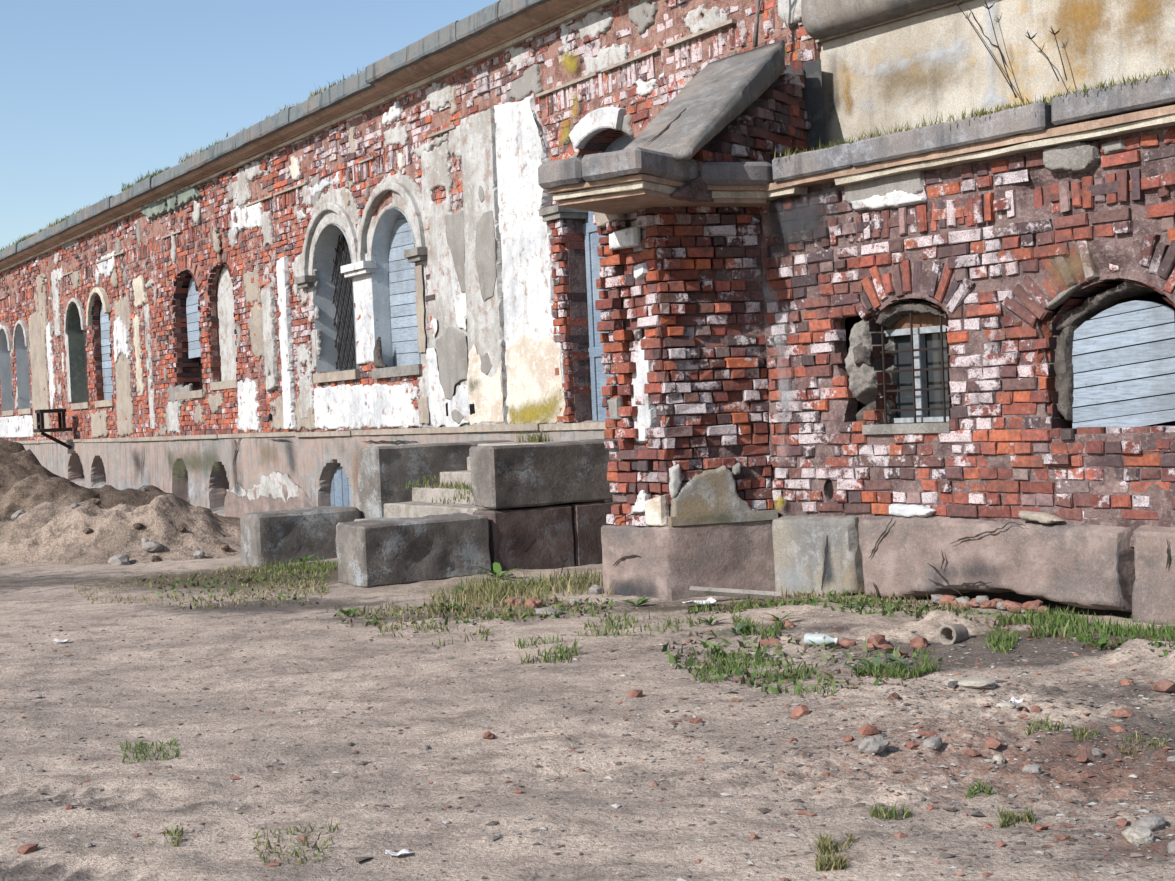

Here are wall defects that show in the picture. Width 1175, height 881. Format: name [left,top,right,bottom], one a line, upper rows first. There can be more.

flaking render [560,0,658,75]
flaking render [684,4,729,33]
flaking render [777,0,802,28]
flaking render [636,72,665,96]
flaking render [611,107,634,137]
flaking render [90,45,570,438]
flaking render [595,212,641,250]
flaking render [633,262,649,280]
flaking render [0,240,82,439]
flaking render [607,337,658,443]
crack [928,522,1025,595]